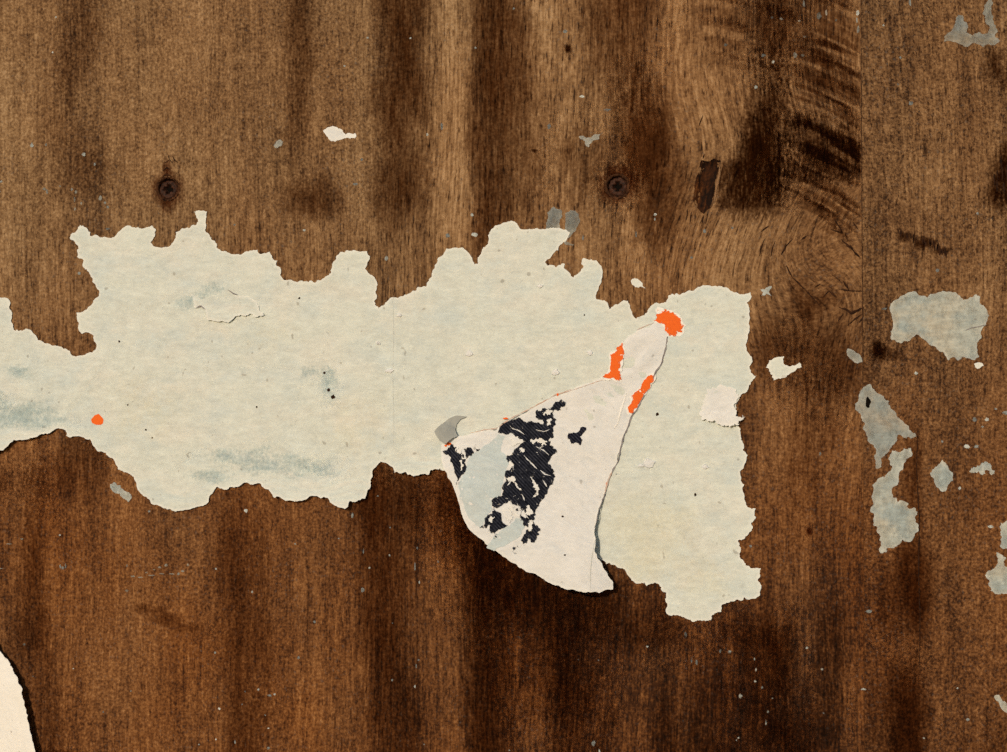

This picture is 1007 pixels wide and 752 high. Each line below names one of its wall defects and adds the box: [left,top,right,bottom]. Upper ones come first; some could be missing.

peeling [455,434,547,551]